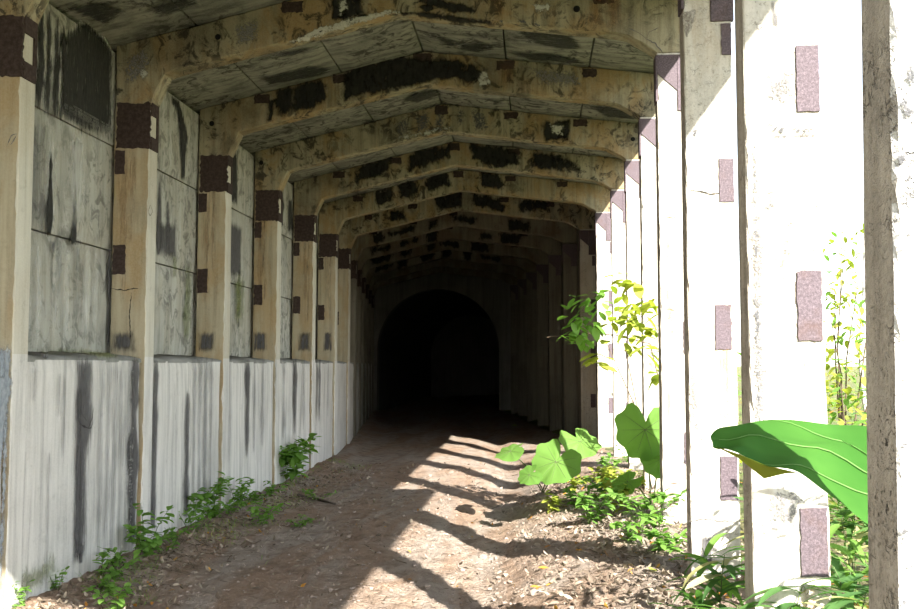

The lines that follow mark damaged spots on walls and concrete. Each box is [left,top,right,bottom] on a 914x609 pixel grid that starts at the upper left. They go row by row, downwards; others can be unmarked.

damp [32,134,56,253]
damp [36,2,125,244]
damp [148,185,176,256]
damp [344,37,551,272]
damp [543,119,570,142]
damp [532,153,581,172]
damp [0,347,13,580]
damp [74,361,101,560]
damp [114,333,140,540]
damp [150,361,159,526]